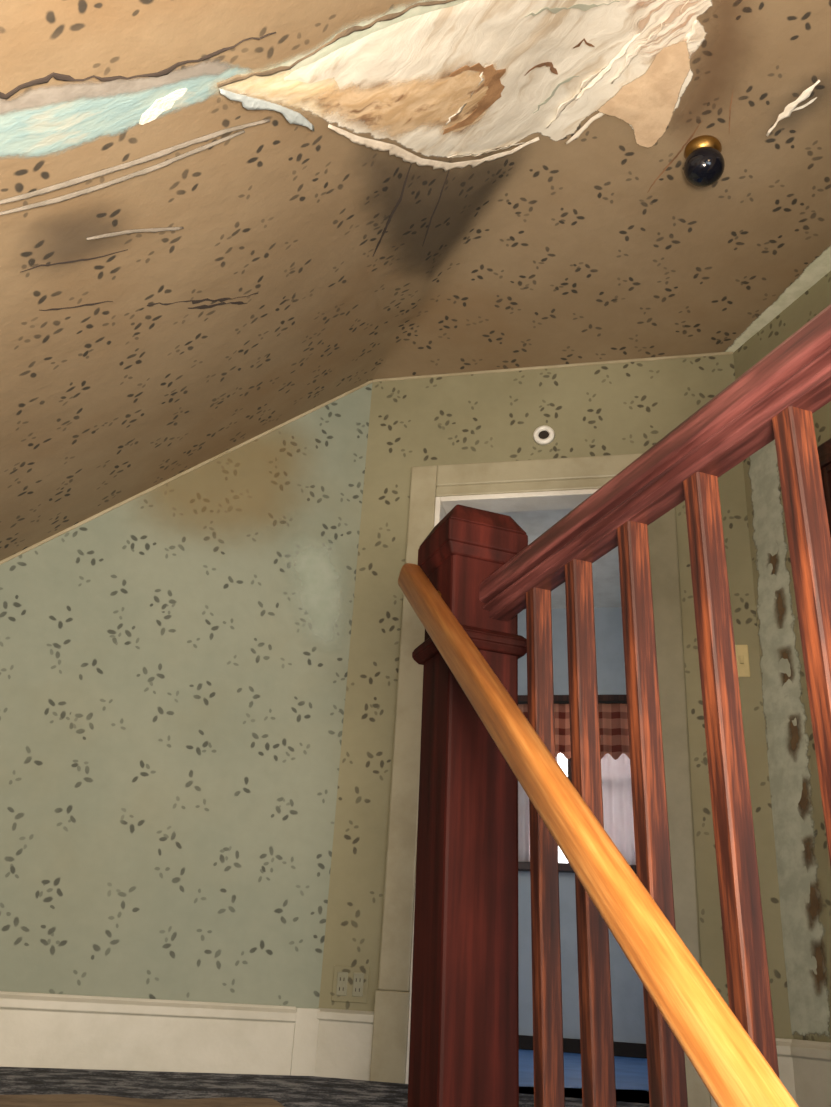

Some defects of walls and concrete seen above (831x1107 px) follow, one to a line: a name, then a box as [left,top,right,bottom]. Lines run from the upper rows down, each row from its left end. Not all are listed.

flaking render [217,0,712,172]